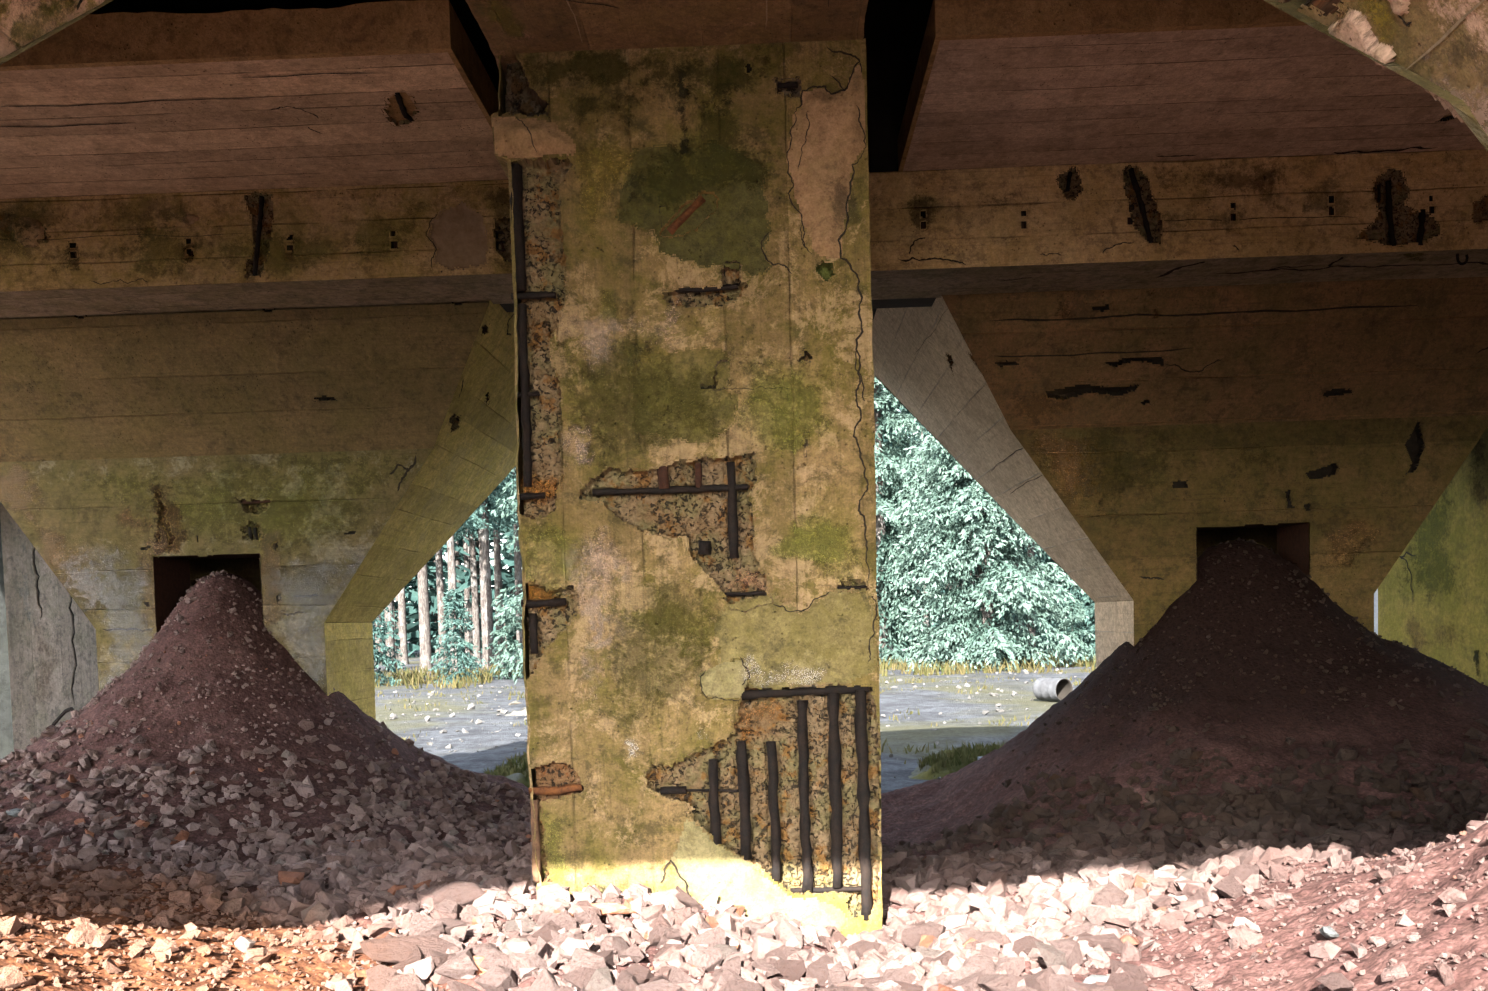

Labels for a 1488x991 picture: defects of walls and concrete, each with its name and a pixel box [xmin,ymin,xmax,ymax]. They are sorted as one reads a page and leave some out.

peeling [1281,0,1396,69]
peeling [1388,0,1411,16]
flaking render [615,143,772,310]
crack [898,237,966,265]
spalling [1122,165,1164,246]
spalling [1356,167,1440,247]
spalling [1472,194,1488,224]
spalling [492,155,575,520]
crack [761,47,877,662]
spalling [521,583,584,680]
spalling [577,347,881,921]